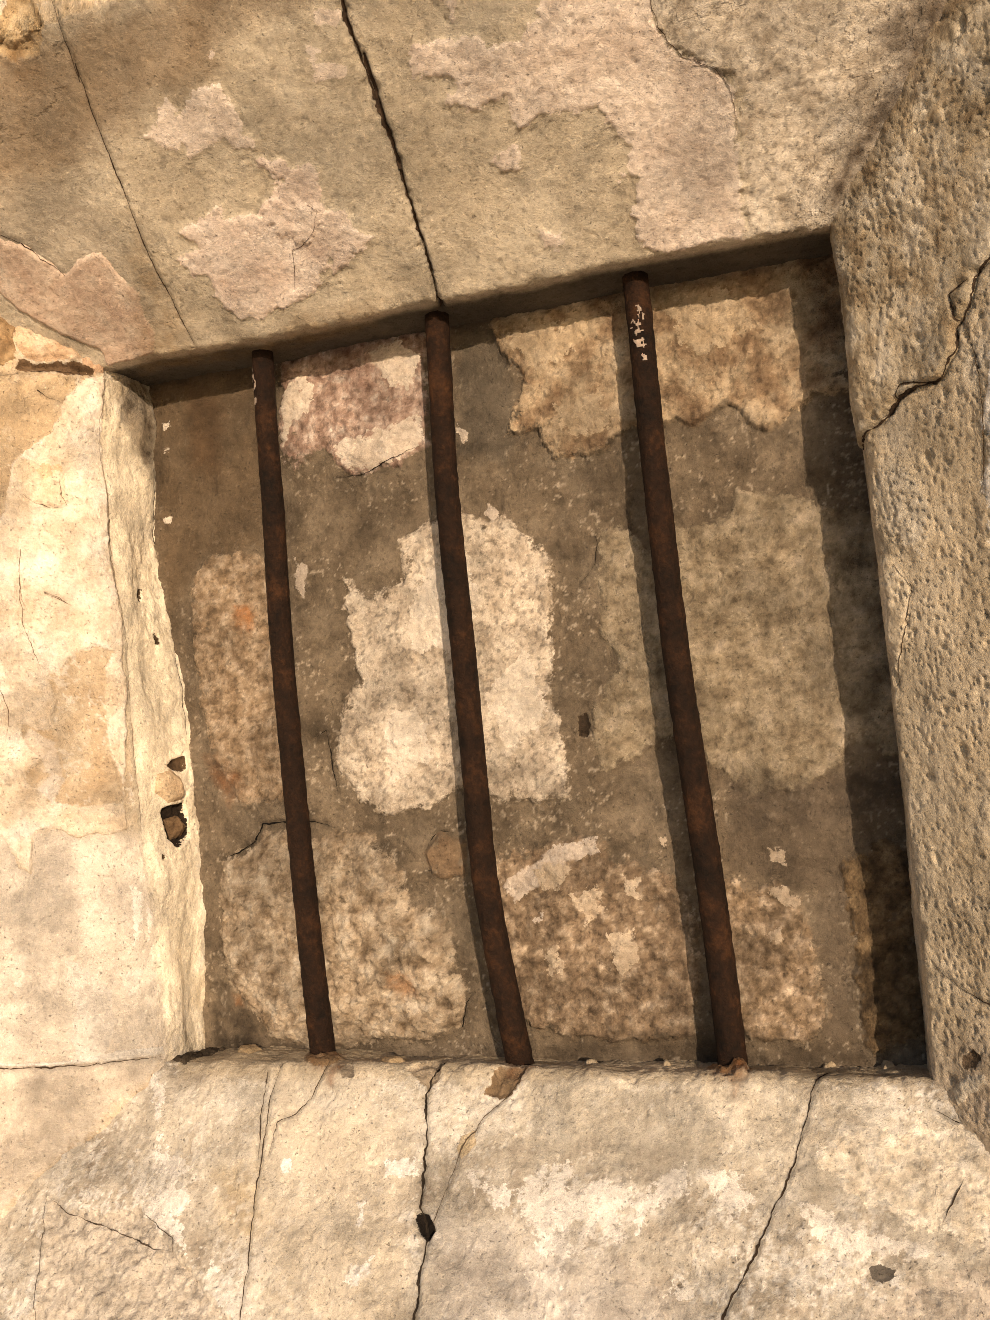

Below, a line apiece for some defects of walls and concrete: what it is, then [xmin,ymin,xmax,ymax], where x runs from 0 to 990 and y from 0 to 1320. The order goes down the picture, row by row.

crack [341,0,445,306]
peeling [399,0,874,258]
peeling [499,307,607,384]
peeling [630,277,767,370]
crack [862,257,990,494]
peeling [398,553,452,662]
peeling [464,540,487,629]
peeling [479,644,555,764]
crack [239,1061,330,1320]
crack [412,1063,522,1320]
rust [496,1060,544,1090]
crack [721,1073,828,1320]